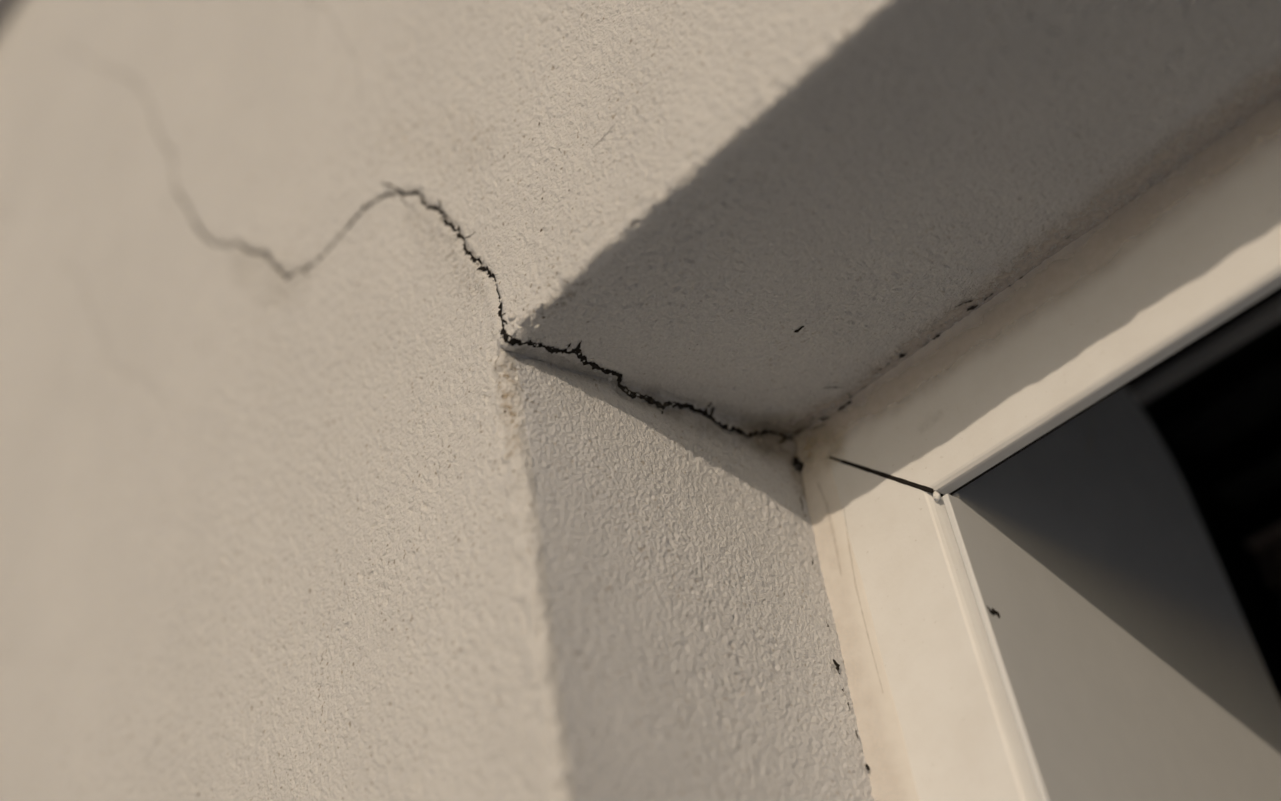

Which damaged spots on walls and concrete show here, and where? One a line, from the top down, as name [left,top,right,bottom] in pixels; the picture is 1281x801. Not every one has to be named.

crack [55,39,940,444]
crack [956,235,1071,312]
crack [841,460,934,493]